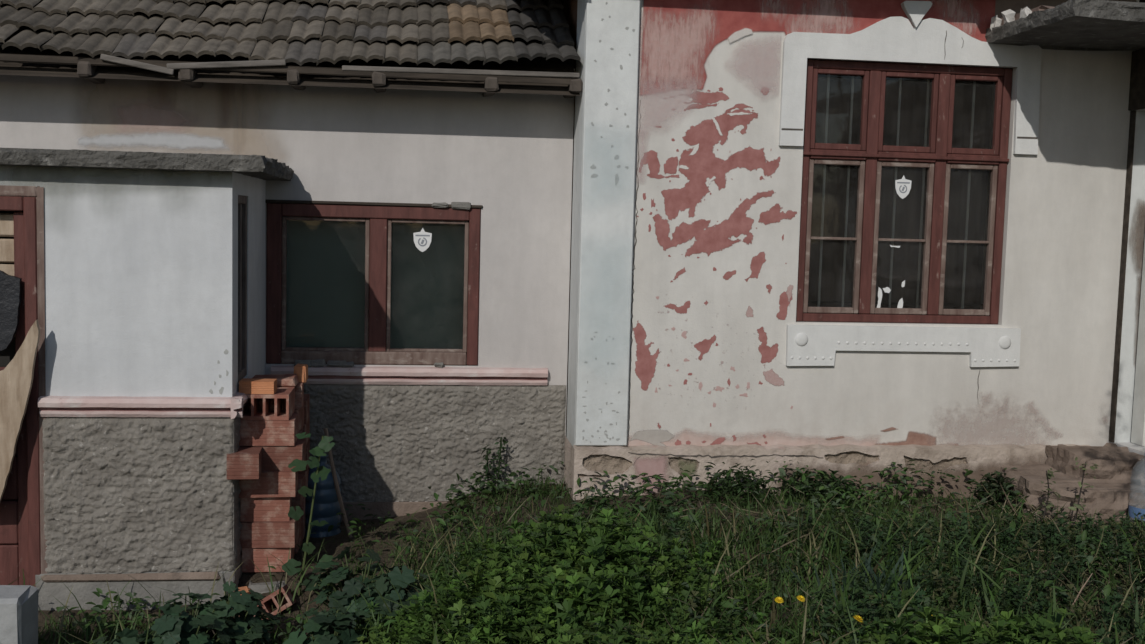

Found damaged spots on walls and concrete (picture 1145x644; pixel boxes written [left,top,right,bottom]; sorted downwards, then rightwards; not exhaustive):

peeling [591,0,1068,320]
peeling [633,306,784,407]
flaking render [578,381,699,496]
flaking render [824,427,966,475]
damp [778,459,1045,500]